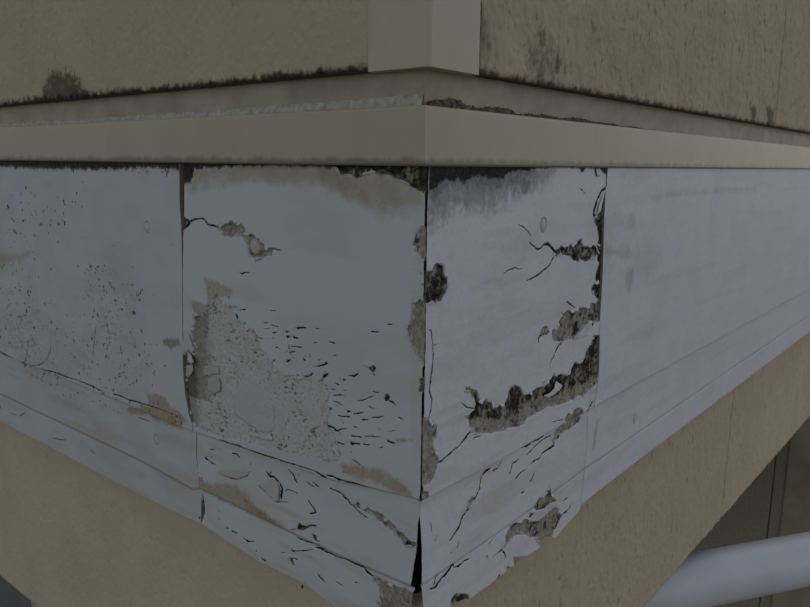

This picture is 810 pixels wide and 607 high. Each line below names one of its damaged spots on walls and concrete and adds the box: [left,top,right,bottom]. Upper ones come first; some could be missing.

water stain [429,166,549,190]
peeling [185,218,281,261]
peeling [412,208,427,261]
crack [505,225,599,281]
crack [1,352,171,422]
peeling [182,295,341,463]
peeling [404,263,448,394]
peeling [462,280,600,439]
crack [205,310,593,590]
spalling [420,416,439,501]
spalling [285,523,415,607]
spalling [486,481,570,579]